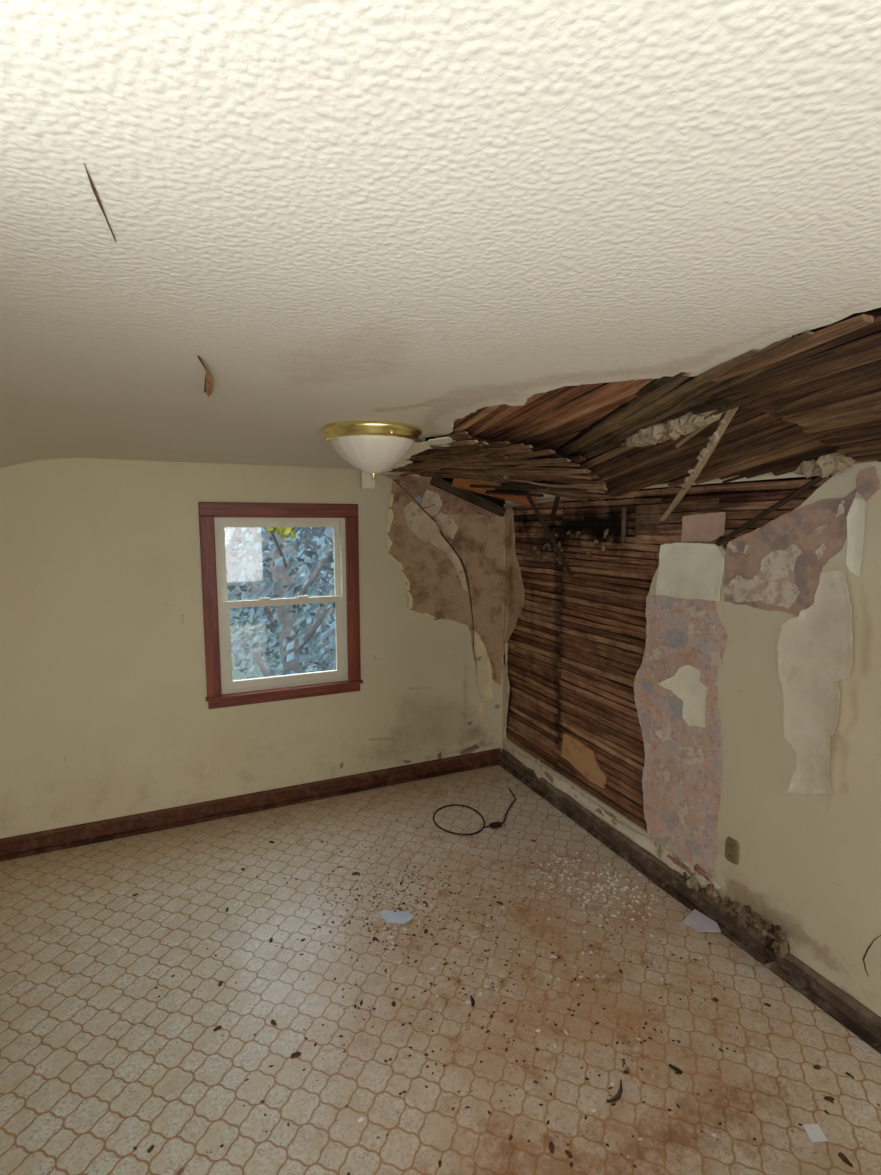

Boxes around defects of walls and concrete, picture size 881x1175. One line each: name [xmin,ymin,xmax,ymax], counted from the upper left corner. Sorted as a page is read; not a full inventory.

crack [84,163,117,243]
flaking render [380,466,880,963]